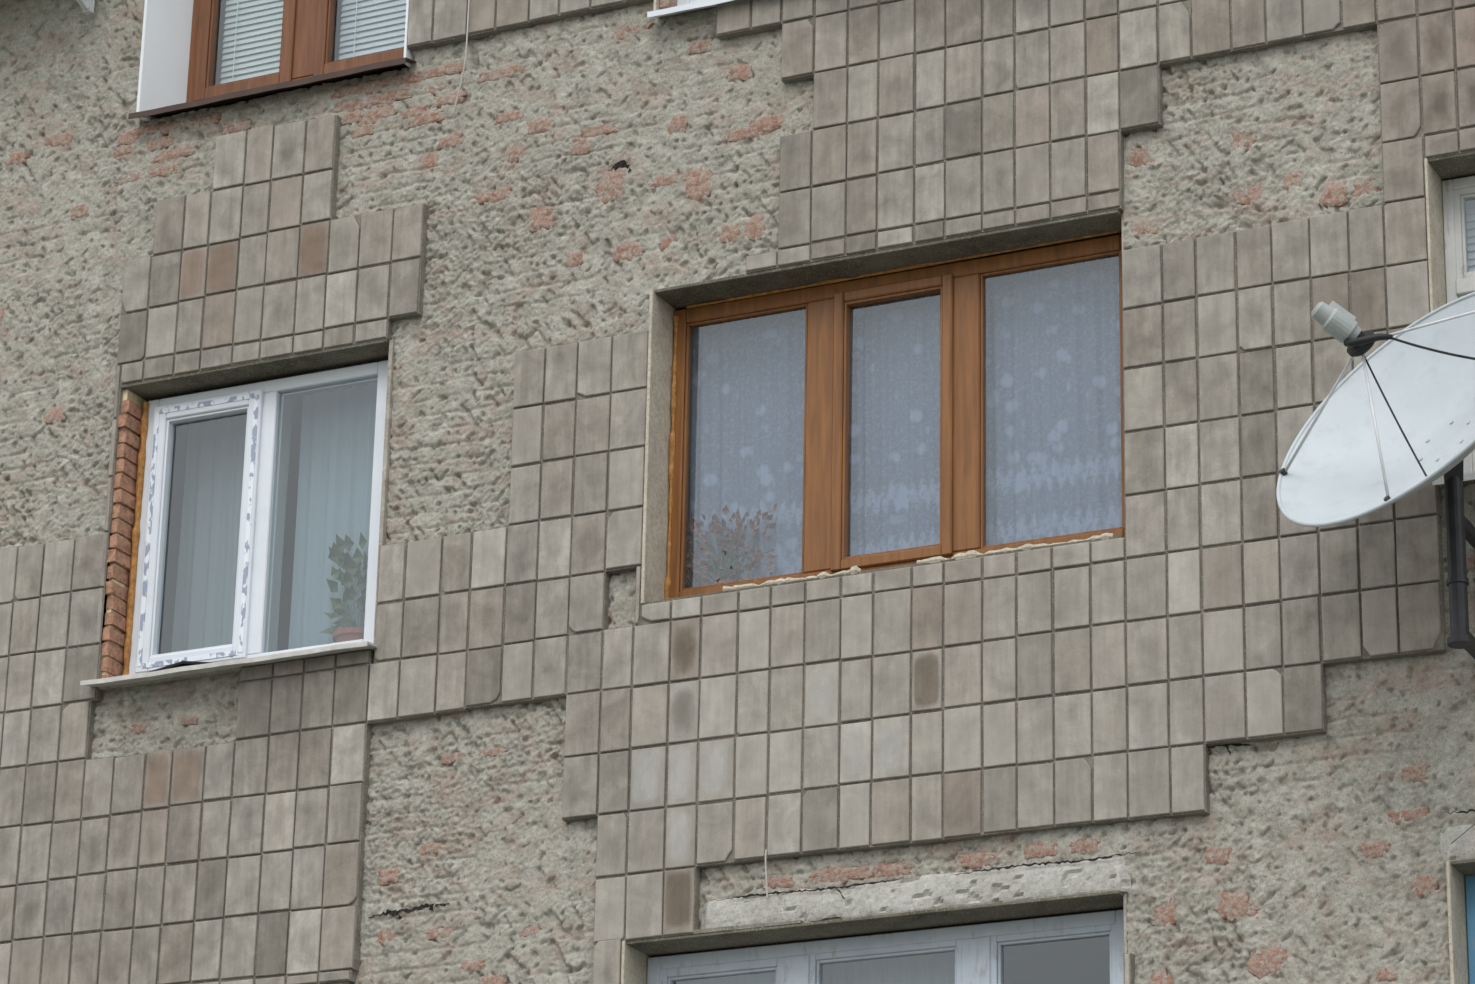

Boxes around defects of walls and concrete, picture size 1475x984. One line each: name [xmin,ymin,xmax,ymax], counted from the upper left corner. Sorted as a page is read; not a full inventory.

spalling [0,0,814,549]
spalling [1123,29,1383,250]
spalling [91,671,241,759]
spalling [355,698,597,984]
spalling [699,484,1475,984]